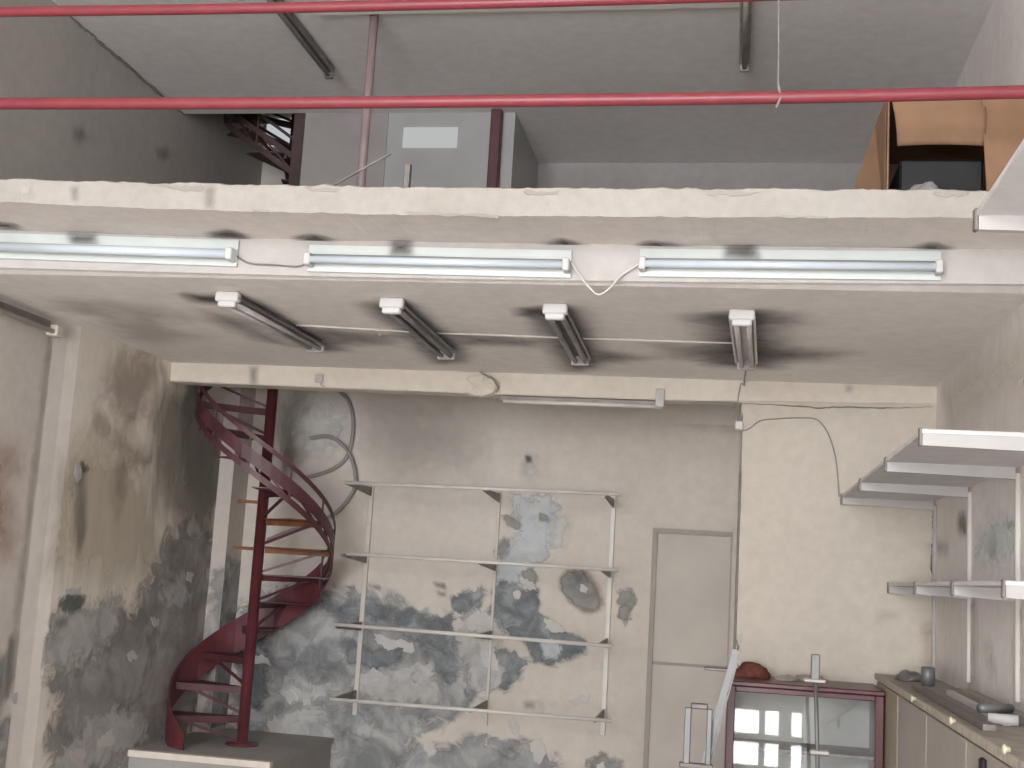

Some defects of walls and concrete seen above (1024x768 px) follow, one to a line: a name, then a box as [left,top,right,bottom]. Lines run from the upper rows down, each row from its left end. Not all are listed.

spalling [435,494,586,697]
spalling [561,570,600,611]
spalling [617,588,636,622]
peeling [255,654,271,666]
peeling [260,633,449,755]
peeling [51,701,149,768]